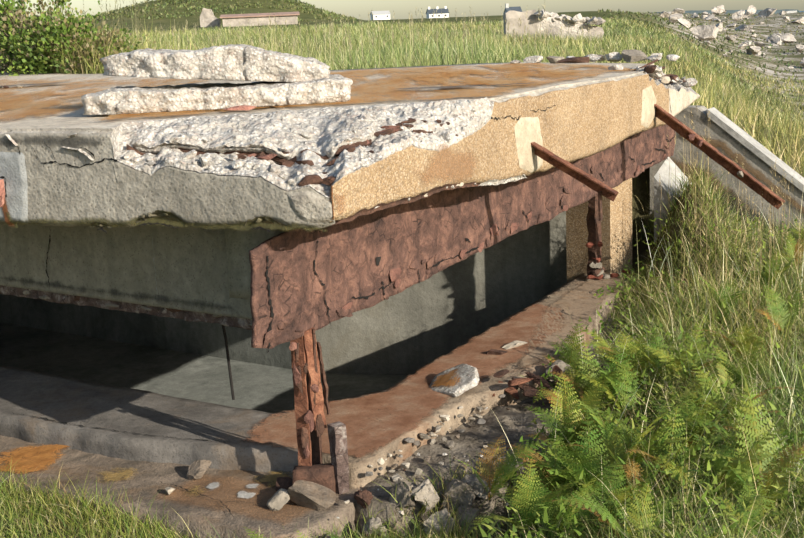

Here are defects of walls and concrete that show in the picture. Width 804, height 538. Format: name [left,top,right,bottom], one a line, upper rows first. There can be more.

crack [30,145,117,168]
spalling [113,97,527,225]
corrosion [663,144,750,211]
corrosion [2,197,17,226]
spalling [134,210,187,228]
corrosion [478,187,572,252]
corrosion [243,302,563,459]